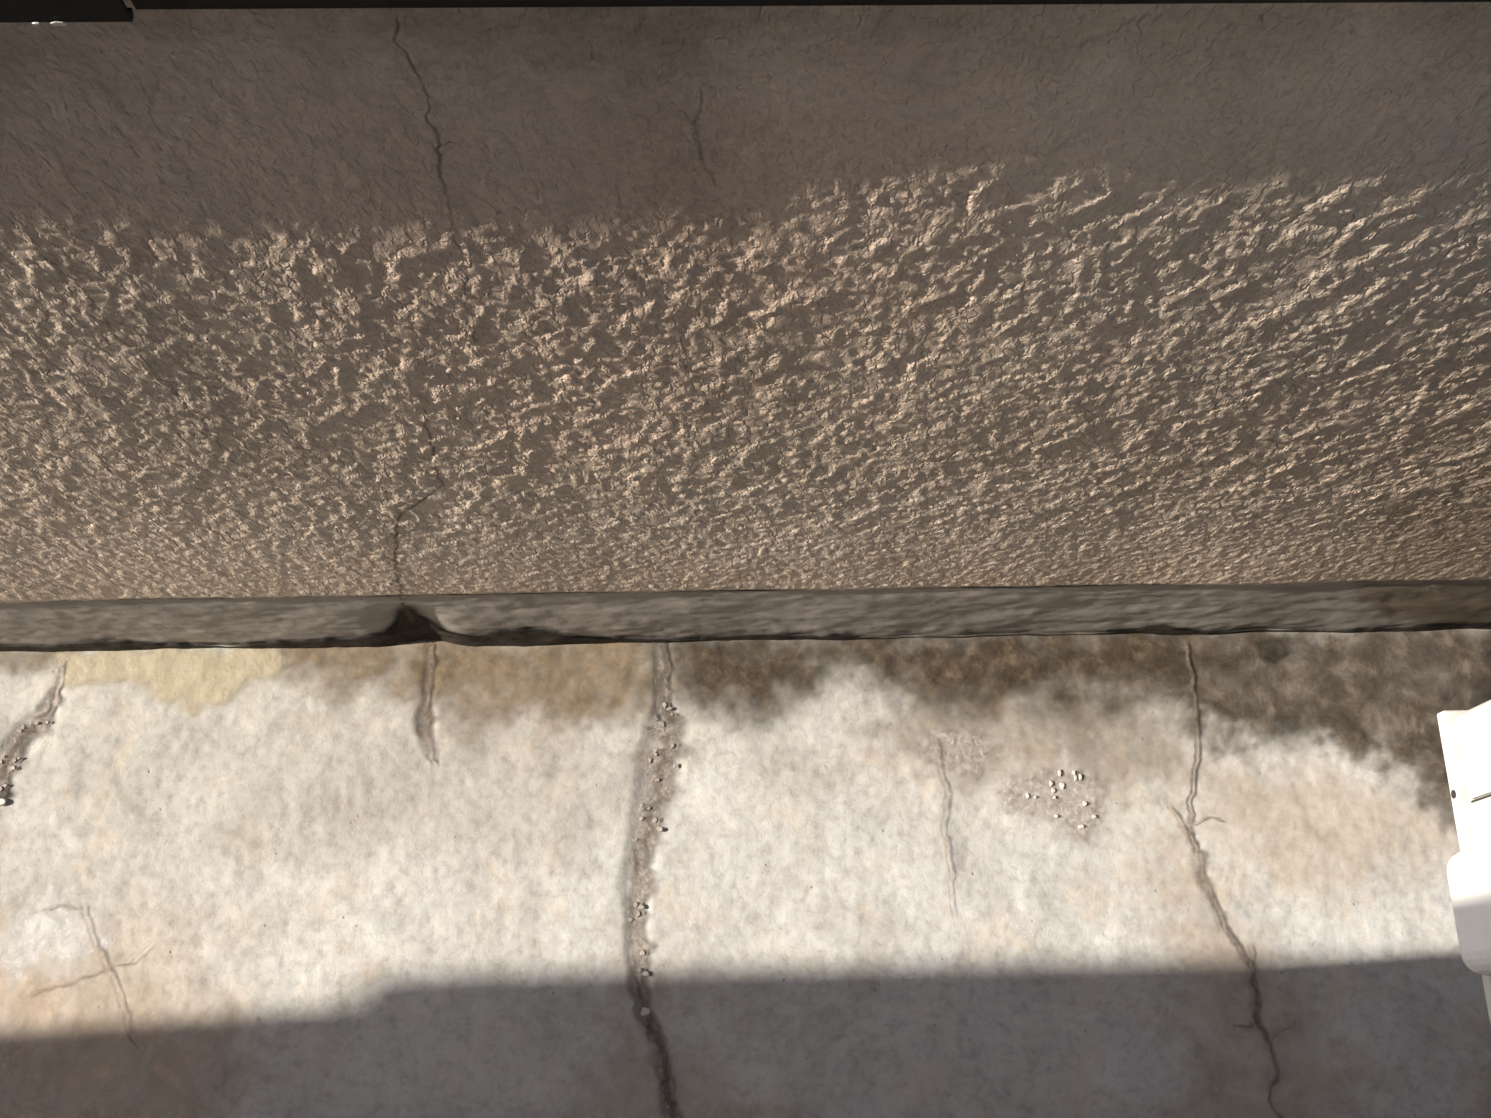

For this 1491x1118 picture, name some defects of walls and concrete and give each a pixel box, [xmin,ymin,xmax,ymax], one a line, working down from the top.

crack [393,20,476,341]
crack [0,410,1491,1118]
leakage [286,584,1491,822]